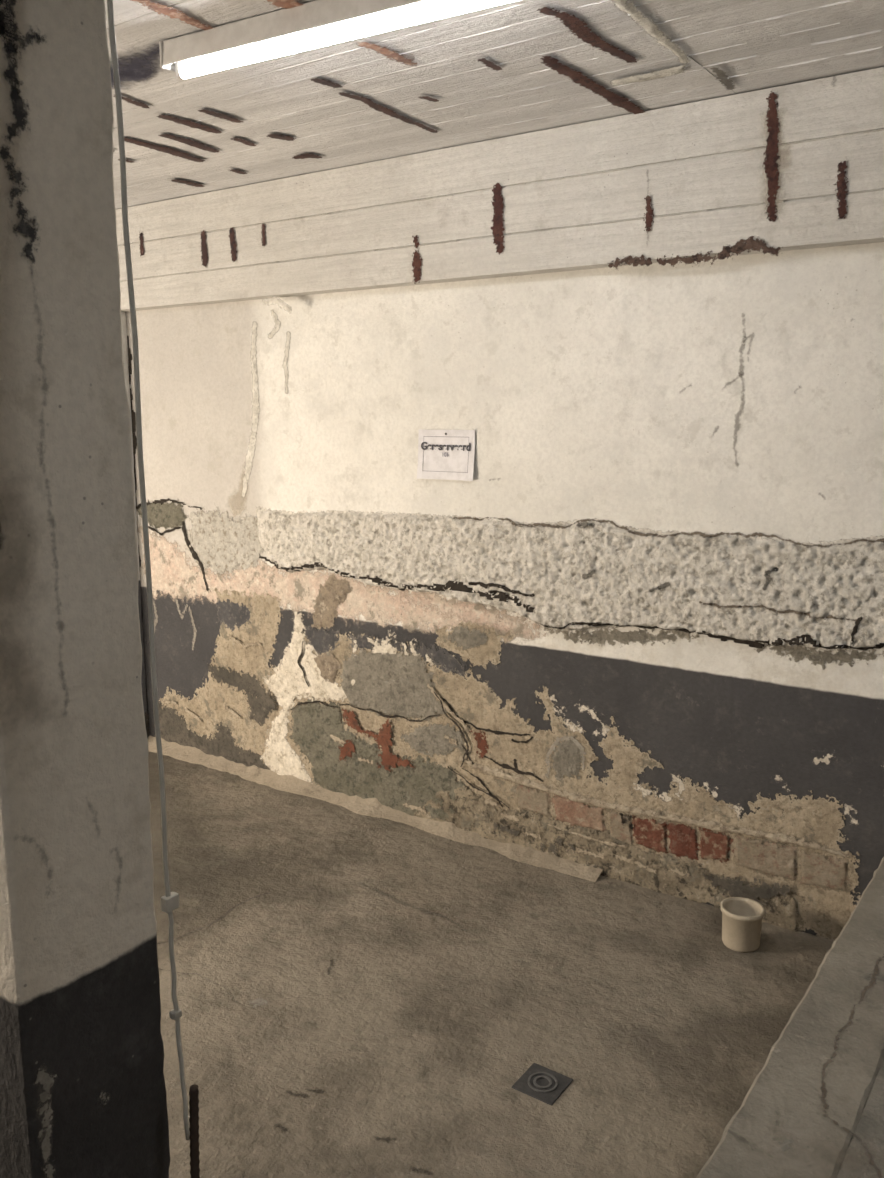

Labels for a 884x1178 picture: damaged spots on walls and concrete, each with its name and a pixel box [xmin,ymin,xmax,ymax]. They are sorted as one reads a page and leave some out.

corrosion [536,7,637,63]
corrosion [540,56,645,114]
corrosion [113,96,296,162]
corrosion [491,182,505,255]
corrosion [763,91,781,222]
corrosion [834,161,849,219]
corrosion [412,235,423,284]
spalling [757,645,884,670]
peeling [137,500,861,941]
crack [819,957,884,1178]
peeling [35,1066,57,1178]
spalling [189,1084,200,1178]